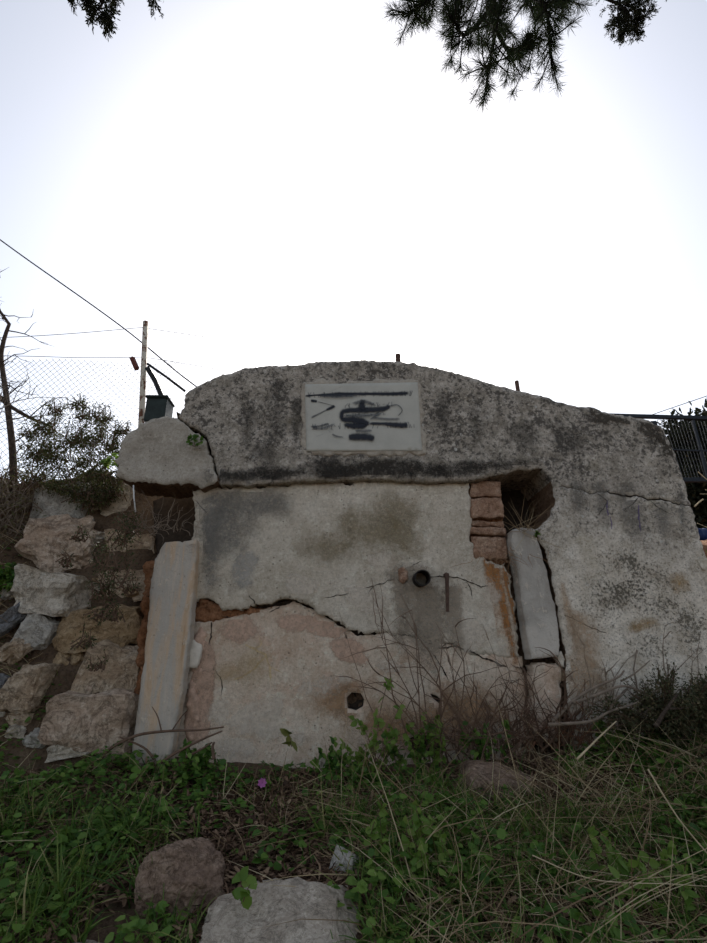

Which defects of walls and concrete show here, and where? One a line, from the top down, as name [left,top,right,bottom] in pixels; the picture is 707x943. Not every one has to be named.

crack [560,486,695,514]
crack [196,602,231,703]
crack [249,561,506,679]
corrosion [484,559,516,657]